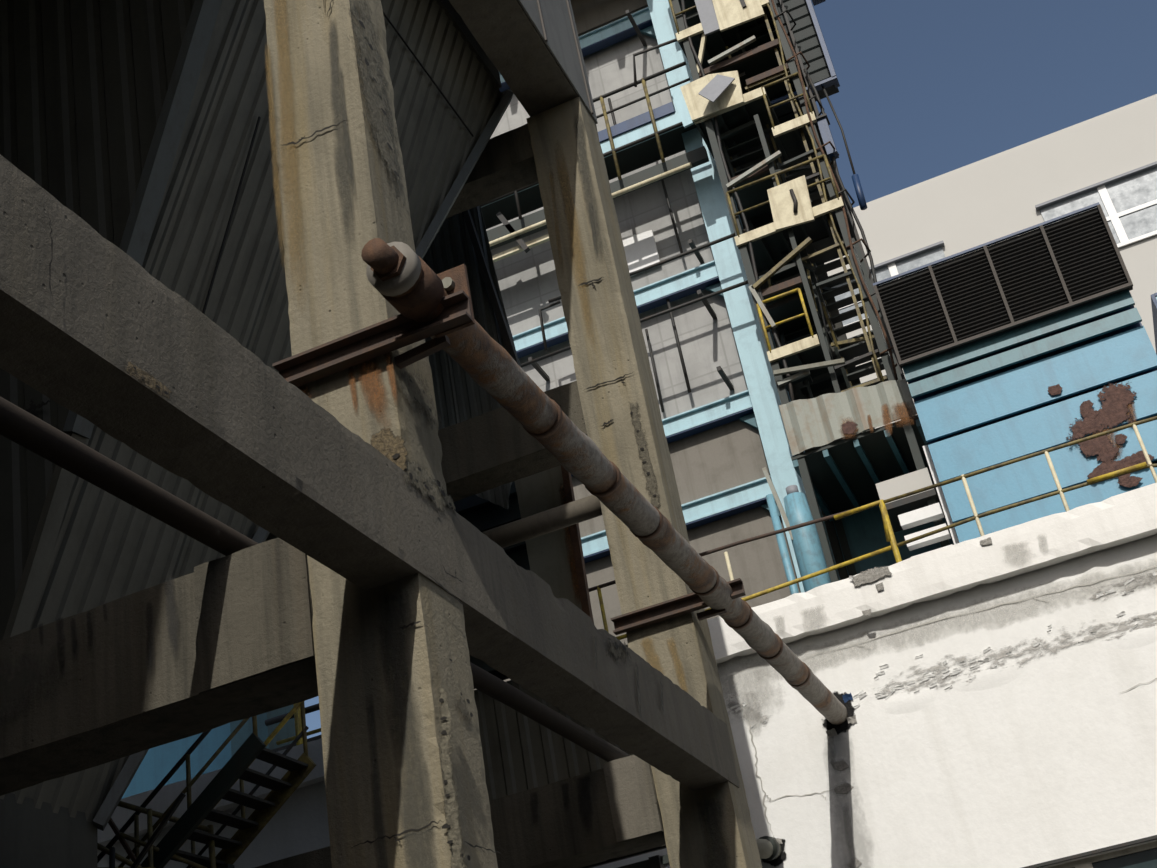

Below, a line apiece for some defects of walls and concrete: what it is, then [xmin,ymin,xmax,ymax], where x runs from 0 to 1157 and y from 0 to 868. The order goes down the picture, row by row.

crack [281,120,345,146]
spalling [347,2,401,201]
rust [349,352,396,410]
spalling [370,427,456,514]
rust [842,403,917,436]
rust [1047,384,1063,395]
rust [1066,381,1154,488]
peeling [1090,572,1157,599]
peeling [821,611,1157,737]
spalling [439,686,473,868]
crack [743,710,841,836]
crack [352,820,442,848]